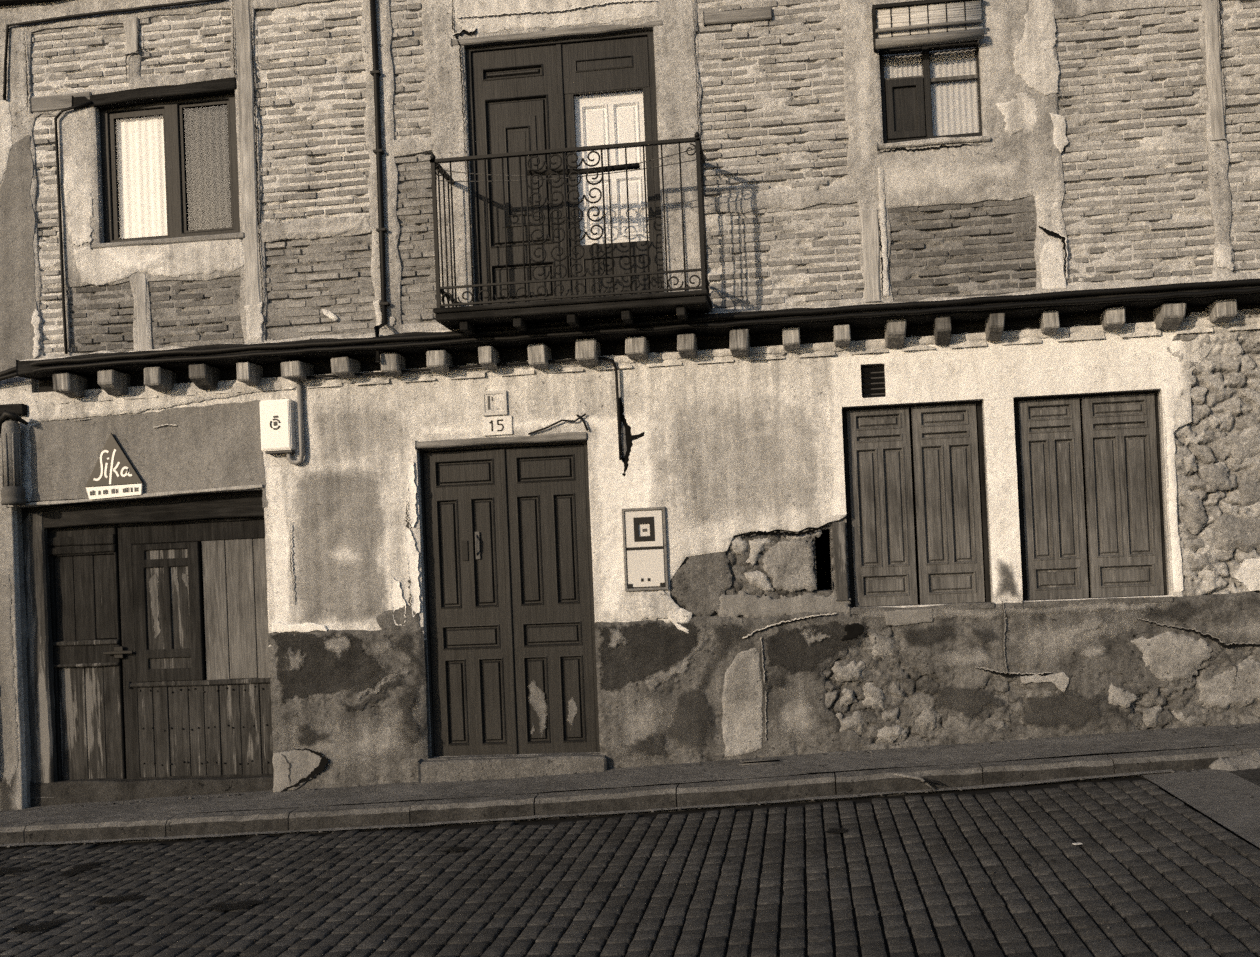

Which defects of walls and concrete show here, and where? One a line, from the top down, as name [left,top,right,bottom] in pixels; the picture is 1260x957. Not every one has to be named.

peeling [996,0,1068,154]
crack [1038,224,1068,289]
spalling [598,522,1260,757]
crack [1137,617,1260,684]
peeling [529,681,547,734]
peeling [567,699,577,724]